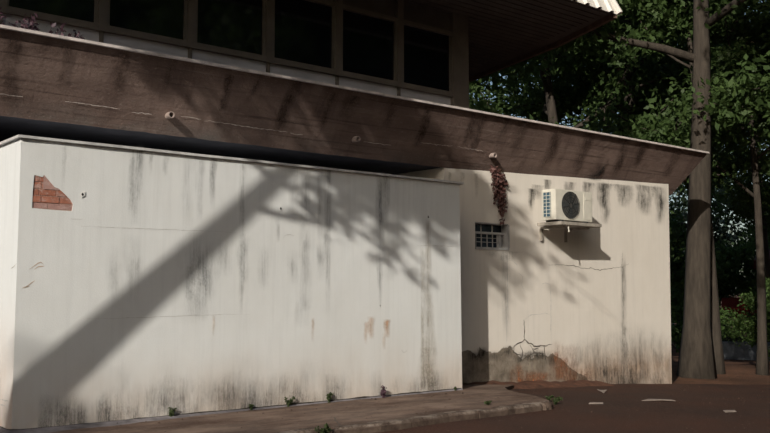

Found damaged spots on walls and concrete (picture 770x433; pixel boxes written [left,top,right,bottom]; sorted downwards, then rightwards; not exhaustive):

flaking render [32,175,73,211]
crack [506,255,552,362]
peeling [462,344,587,384]